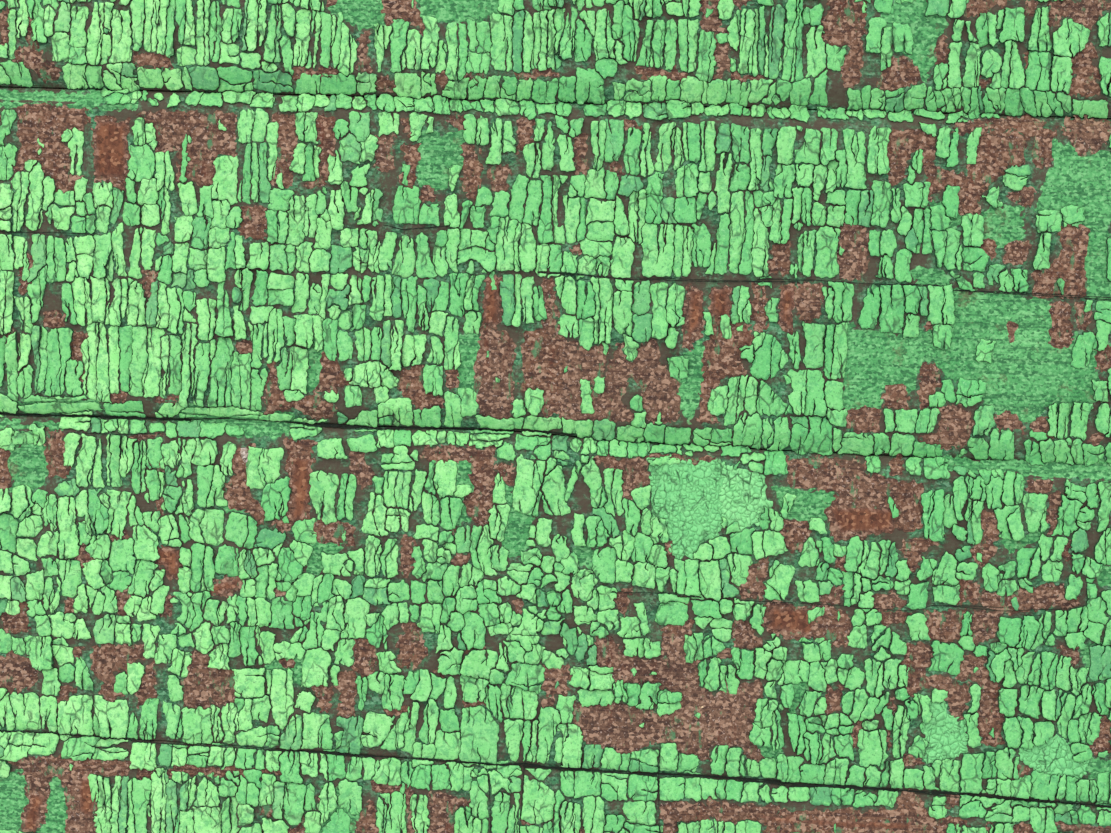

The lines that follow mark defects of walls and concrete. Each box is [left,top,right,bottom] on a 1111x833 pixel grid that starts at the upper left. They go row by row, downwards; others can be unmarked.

peeling [0,6,238,194]
crack [435,0,1090,124]
peeling [155,338,356,575]
crack [0,234,825,833]
crack [0,0,989,663]
peeling [397,240,824,425]
peeling [837,114,1111,568]
crack [981,264,1111,369]
crack [1023,368,1111,467]
peeling [541,619,783,763]
crack [697,466,1111,833]
peeling [872,579,1080,750]